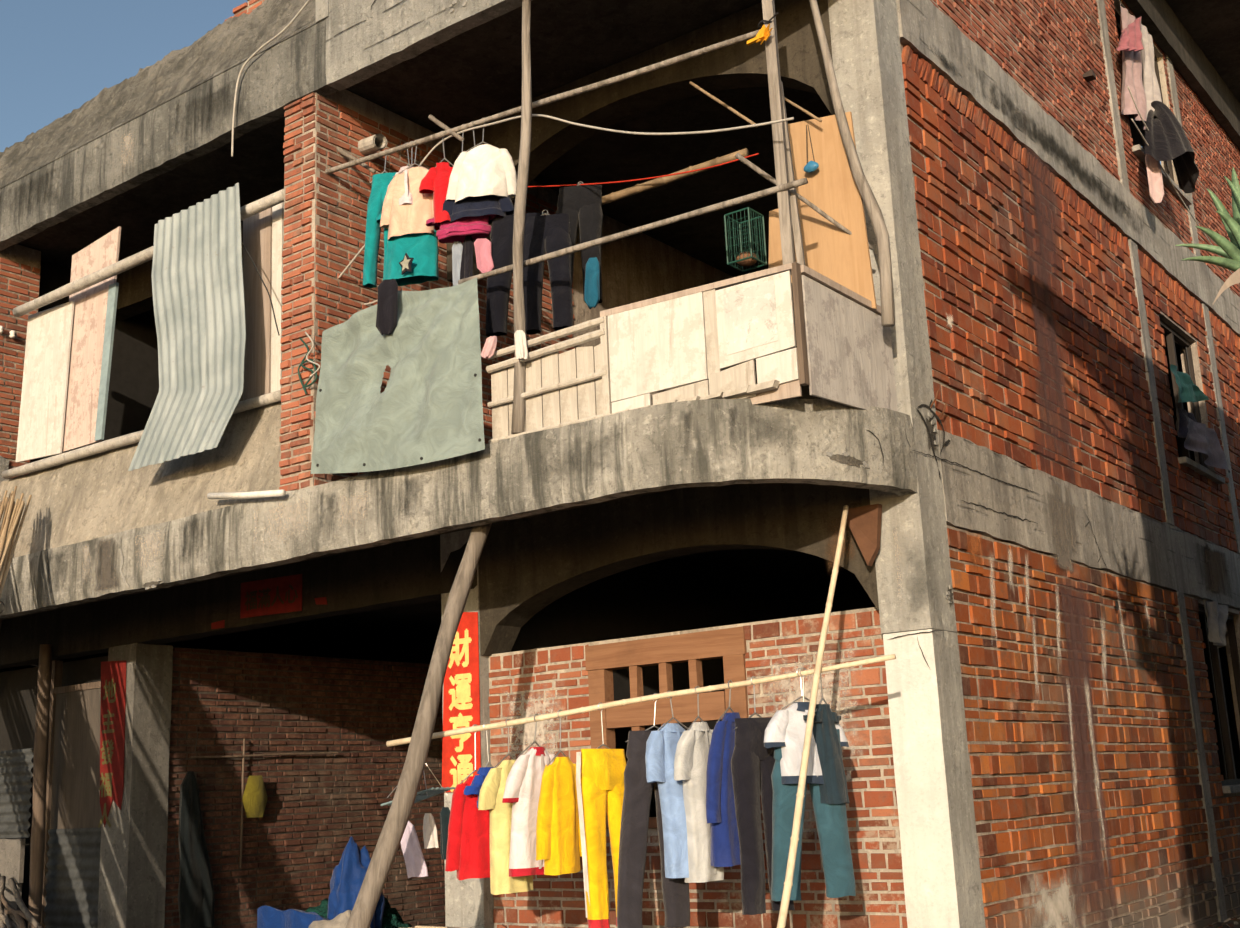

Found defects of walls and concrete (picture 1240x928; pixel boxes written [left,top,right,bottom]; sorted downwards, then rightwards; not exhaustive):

water stain [982,84,1142,467]
water stain [1050,483,1076,572]
water stain [1056,586,1116,921]